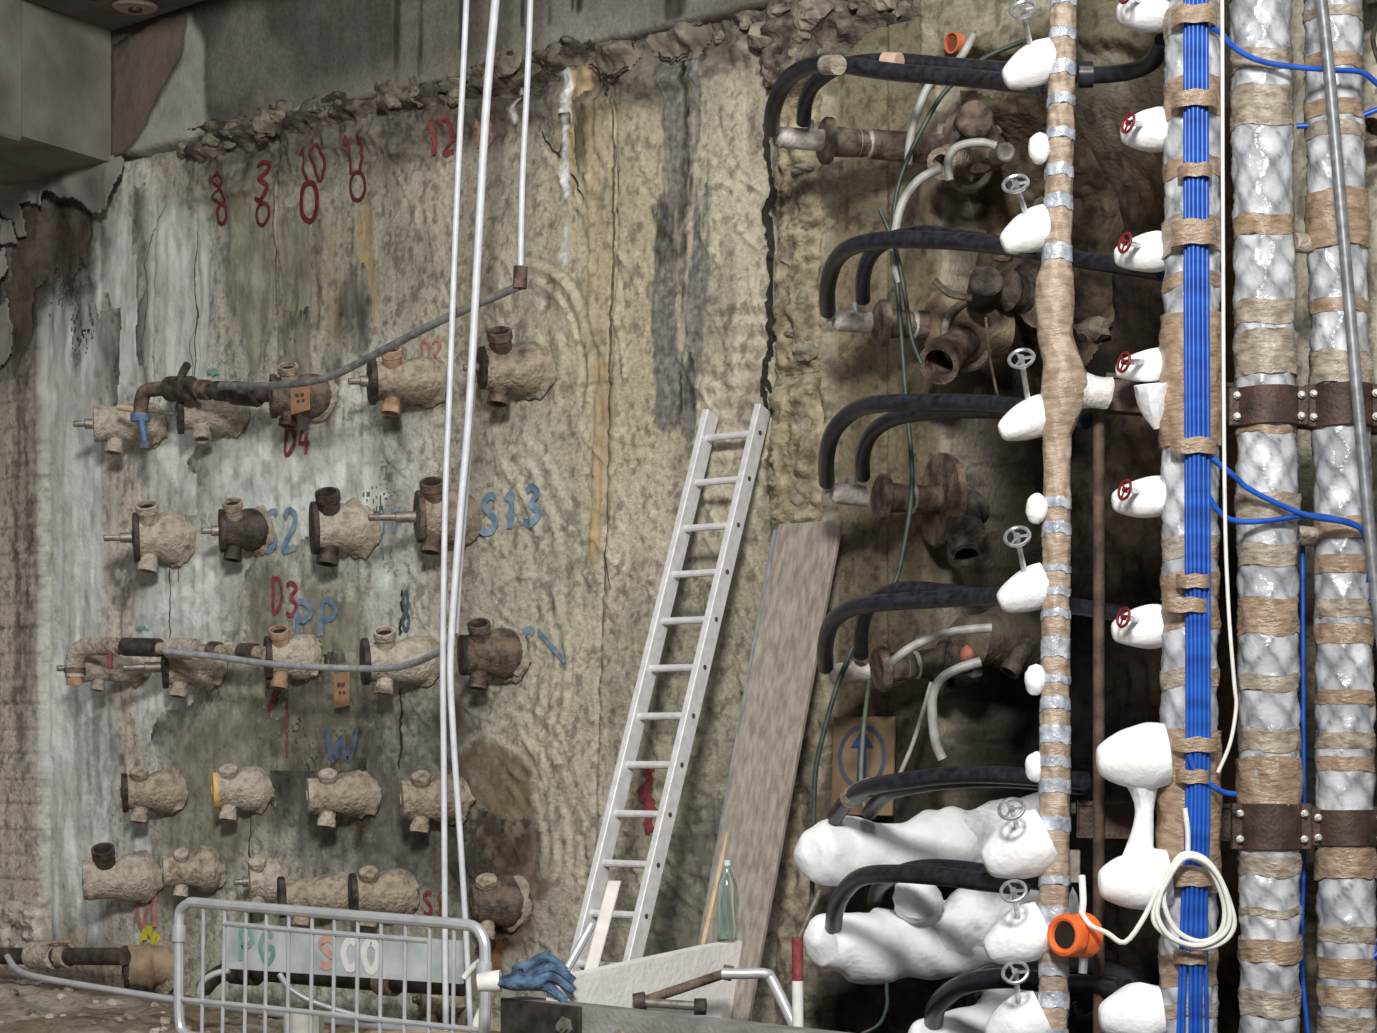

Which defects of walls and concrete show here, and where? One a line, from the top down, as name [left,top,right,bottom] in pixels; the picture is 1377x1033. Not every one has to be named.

spalling [176,35,596,164]
peeling [7,199,94,366]
leakage [651,55,709,442]
crack [760,124,777,414]
peeling [15,452,34,697]
leakage [40,187,546,947]
crack [542,37,694,843]